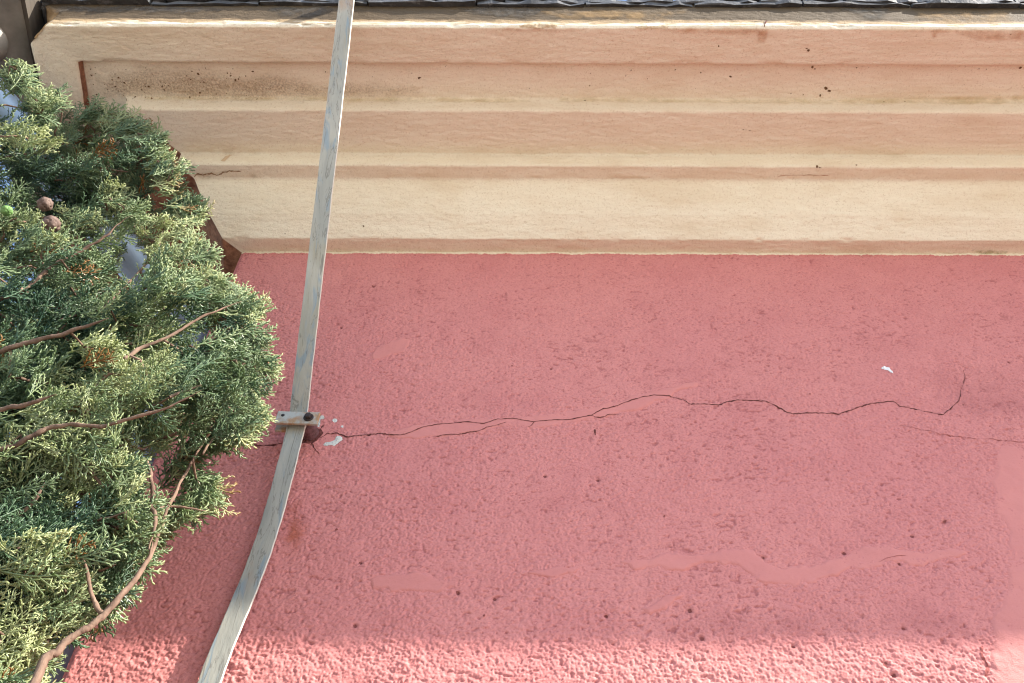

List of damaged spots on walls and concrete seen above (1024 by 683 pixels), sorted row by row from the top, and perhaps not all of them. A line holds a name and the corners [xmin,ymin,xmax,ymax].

crack [312,370,1024,454]